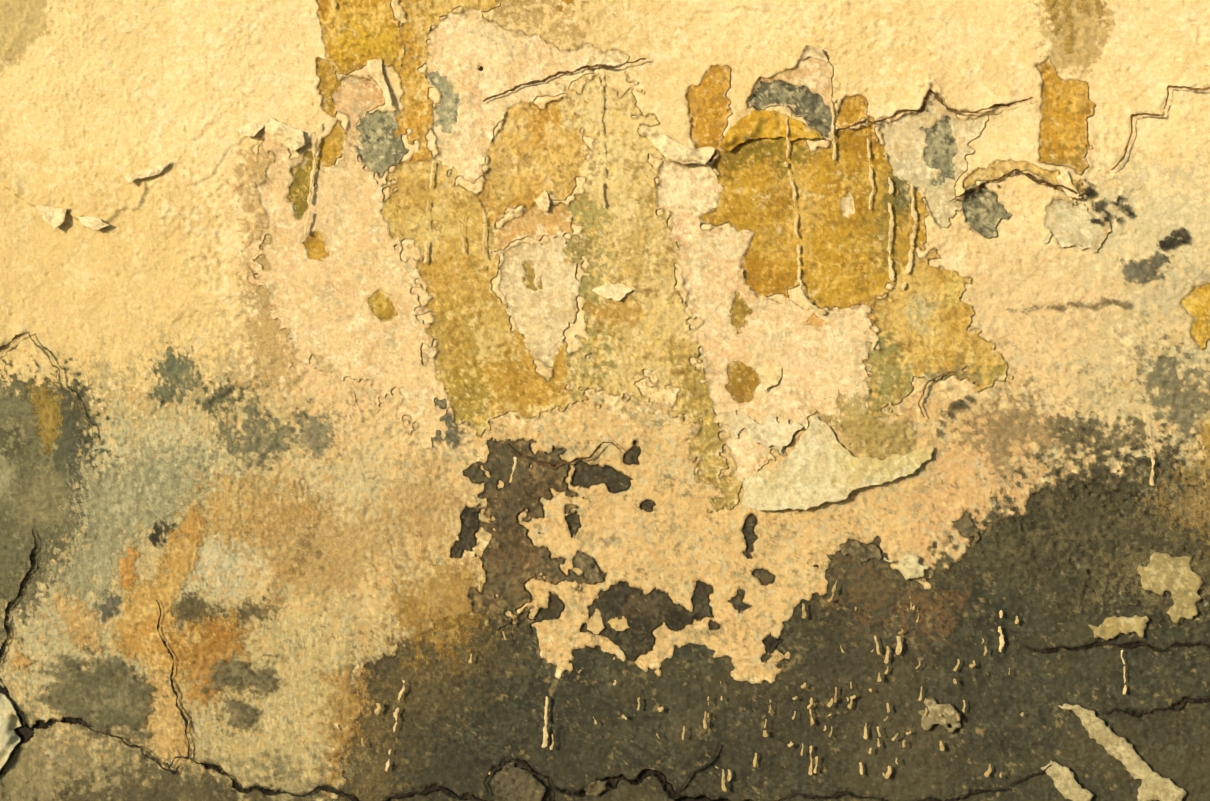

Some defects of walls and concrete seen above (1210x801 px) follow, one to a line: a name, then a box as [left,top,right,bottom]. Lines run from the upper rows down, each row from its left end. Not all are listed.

peeling [235,0,1111,559]
crack [950,169,1083,202]
crack [1111,85,1210,170]
peeling [1181,283,1210,349]
water stain [0,342,523,801]
crack [0,528,886,801]
peeling [333,437,1210,801]
crack [917,765,1052,801]
water stain [915,334,1210,620]